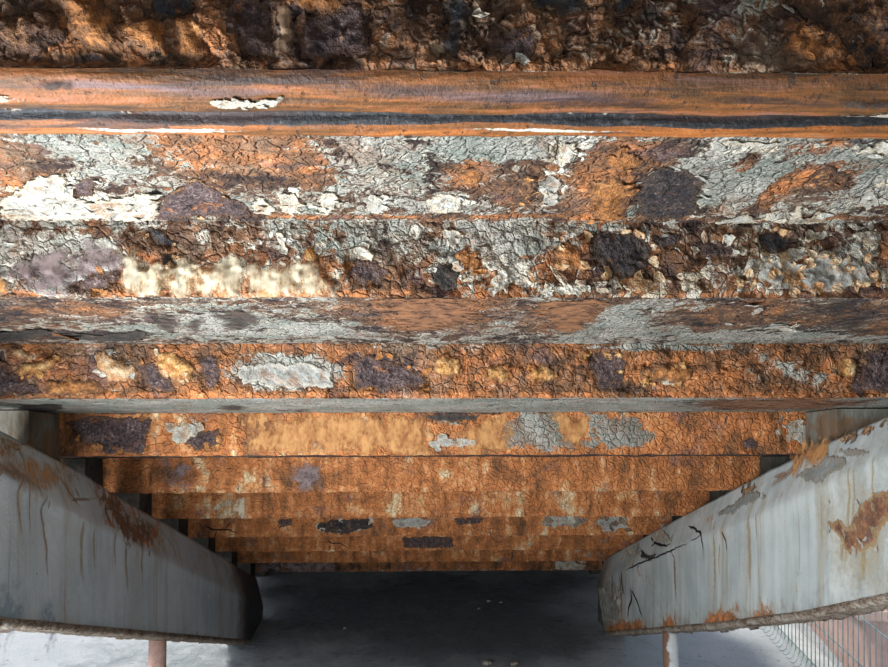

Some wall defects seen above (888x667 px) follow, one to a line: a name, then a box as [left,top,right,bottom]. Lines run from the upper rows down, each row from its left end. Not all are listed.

corrosion [0,0,210,60]
corrosion [222,0,372,68]
peeling [0,174,162,222]
peeling [252,192,344,217]
peeling [426,193,465,214]
peeling [734,205,888,298]
peeling [537,279,591,297]
peeling [237,361,334,391]
corrosion [65,413,152,456]
corrosion [186,428,224,452]
corrosion [826,469,888,575]
crack [621,526,703,617]